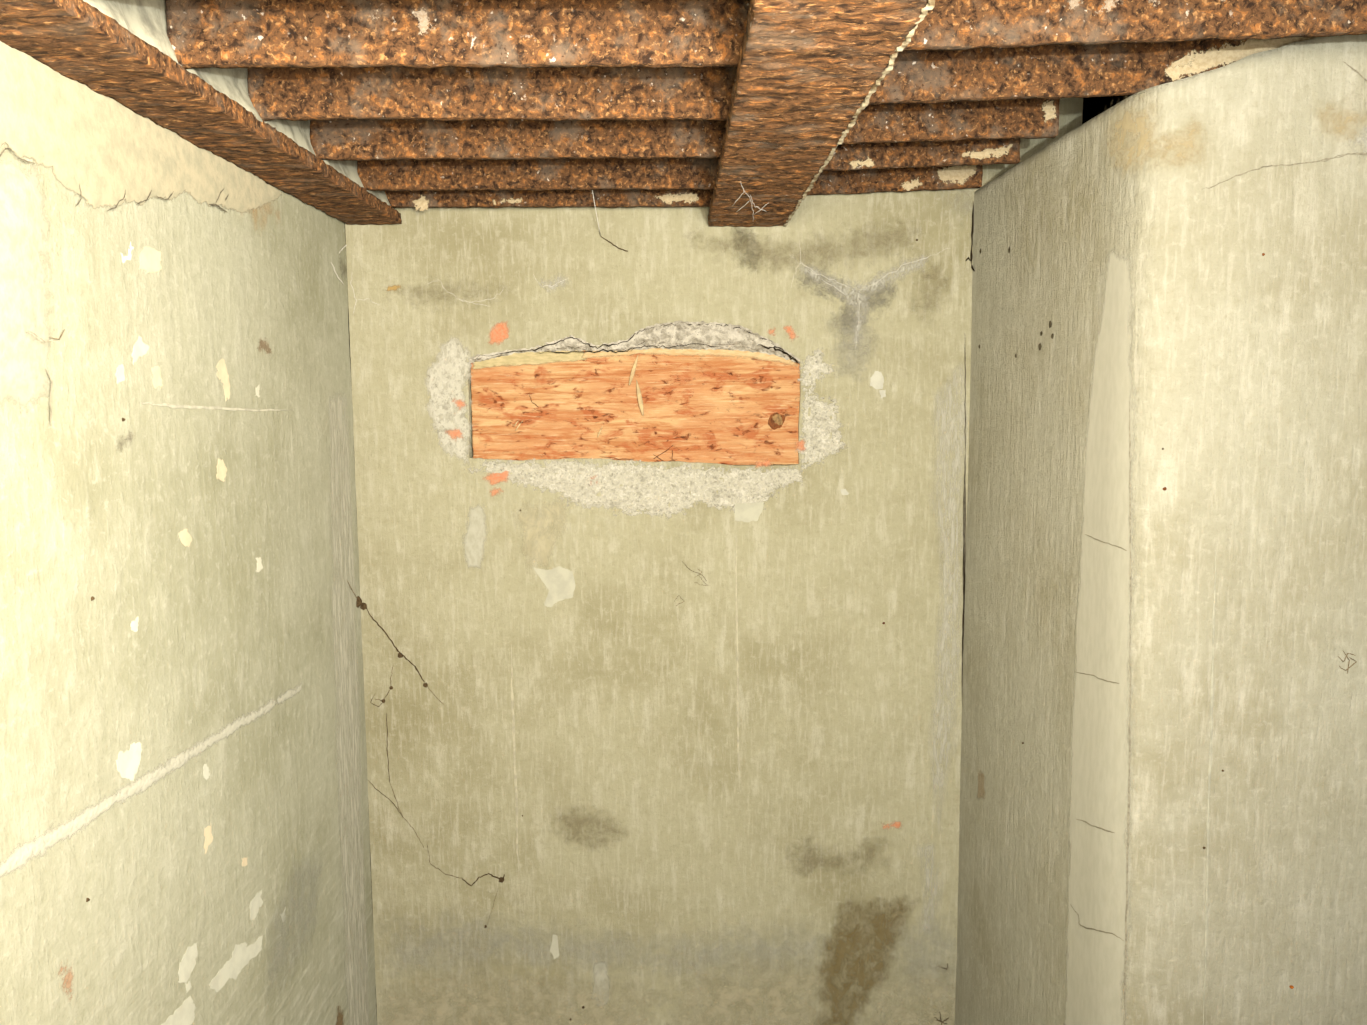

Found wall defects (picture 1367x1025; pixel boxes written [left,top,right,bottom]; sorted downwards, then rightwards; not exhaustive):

crack [0,148,35,164]
crack [76,184,174,211]
crack [1203,153,1367,189]
damp [790,244,948,348]
peeling [427,320,846,523]
peeling [249,890,263,920]
peeling [161,943,198,1025]
peeling [209,936,263,993]
damp [689,904,905,1025]